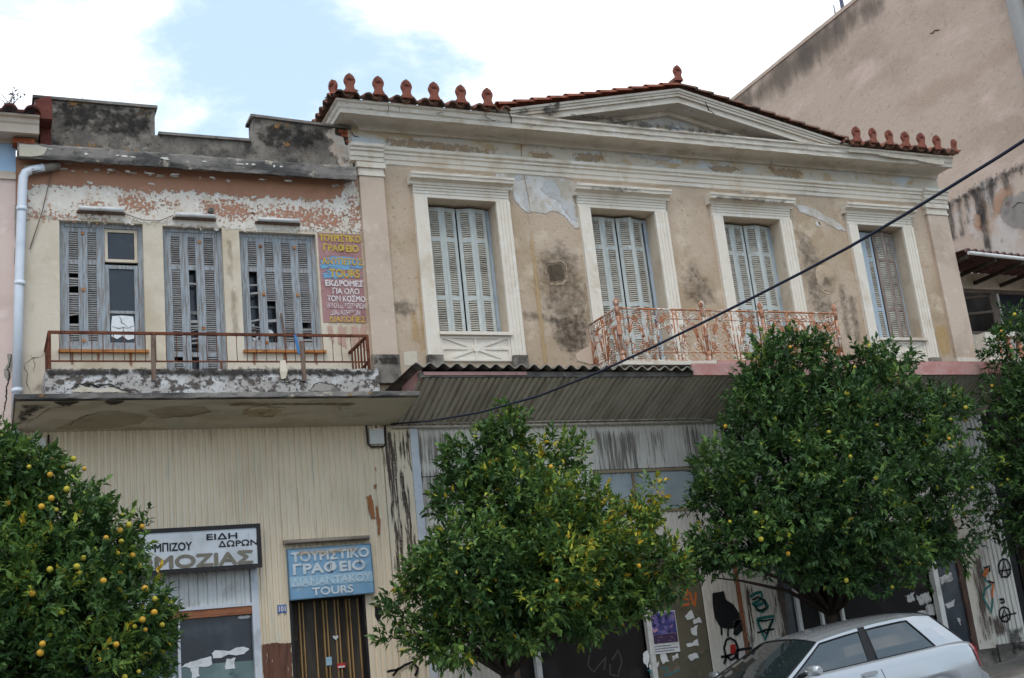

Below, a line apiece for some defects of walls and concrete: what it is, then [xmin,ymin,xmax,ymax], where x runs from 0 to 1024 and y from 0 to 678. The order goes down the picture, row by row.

water stain [59,103,150,134]
water stain [258,123,324,148]
peeling [14,144,362,238]
flaking render [494,173,579,229]
flaking render [794,203,847,231]
water stain [947,163,1024,249]
water stain [531,239,576,363]